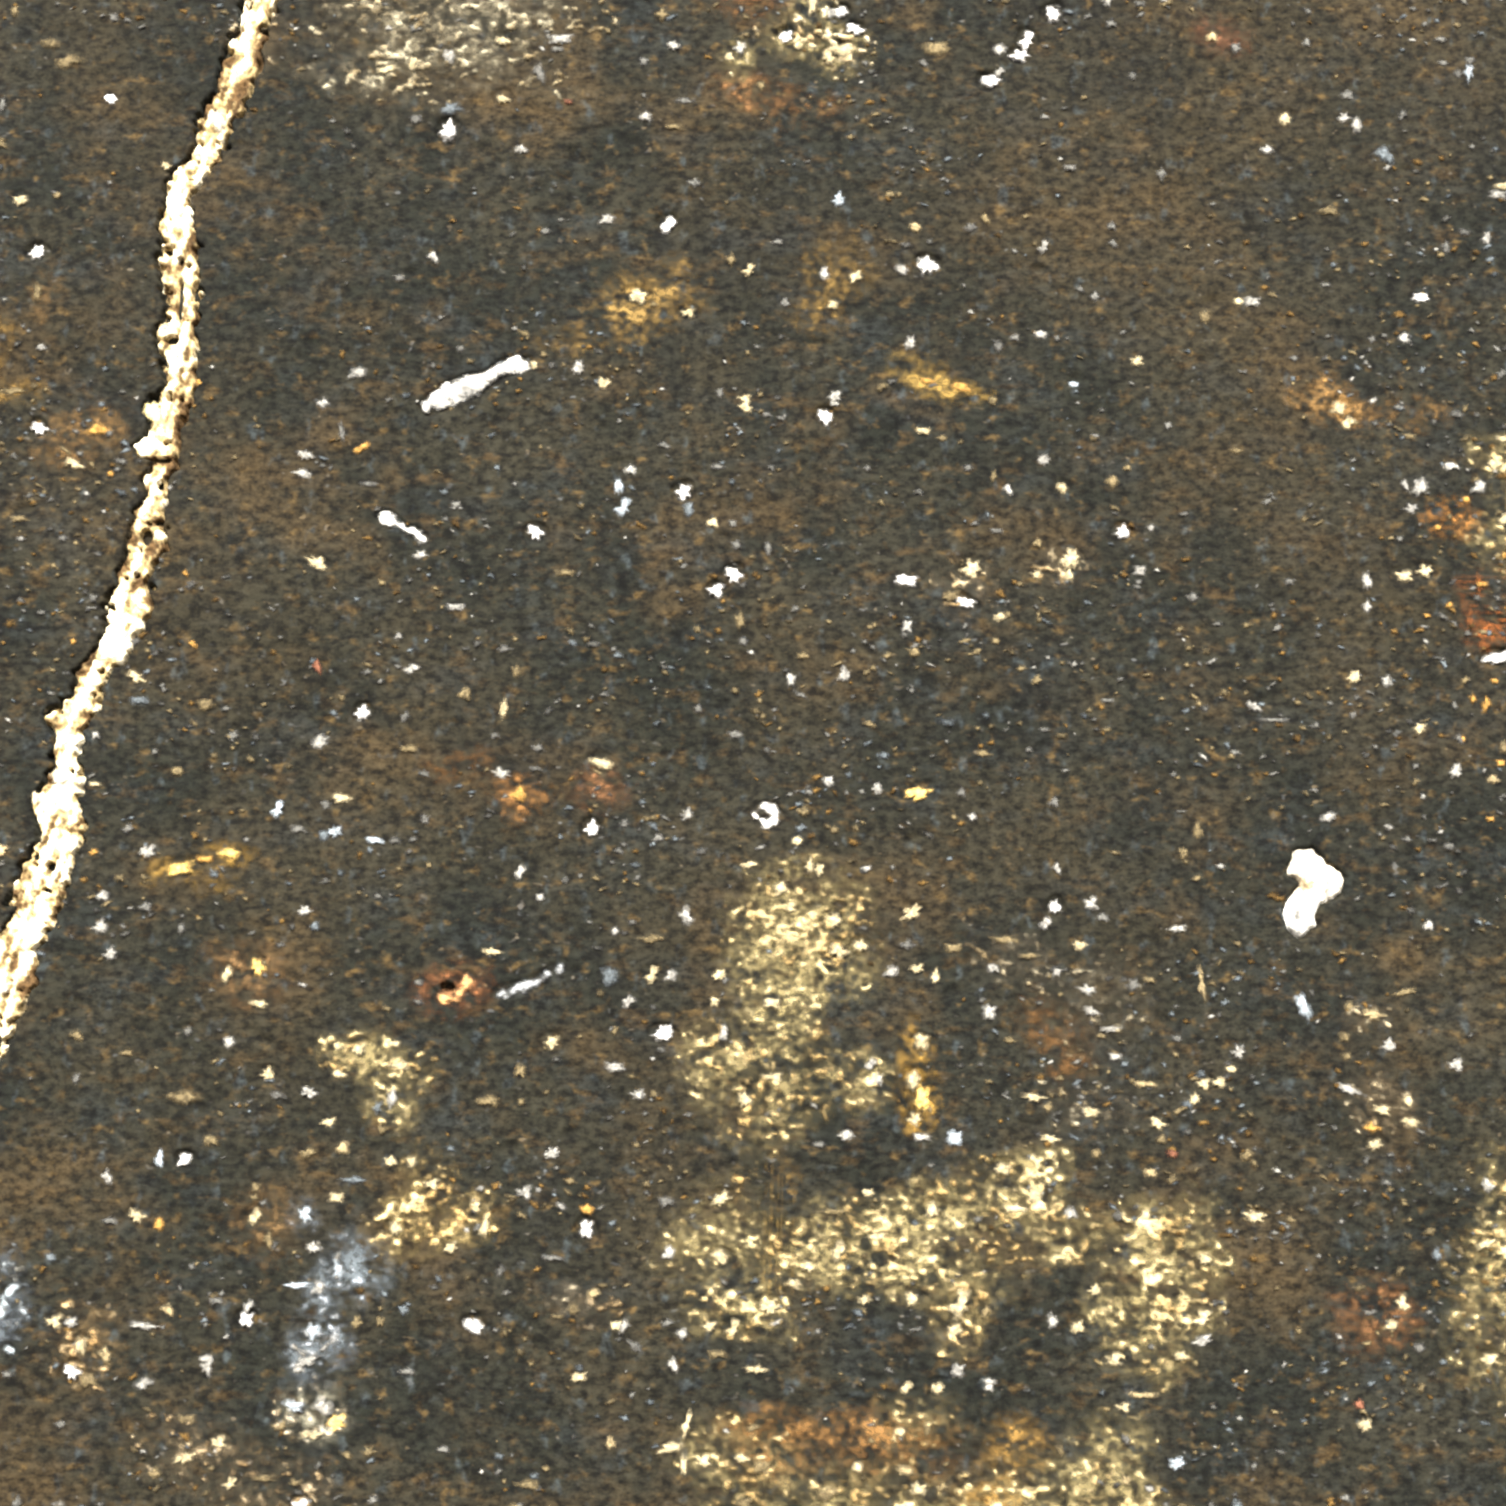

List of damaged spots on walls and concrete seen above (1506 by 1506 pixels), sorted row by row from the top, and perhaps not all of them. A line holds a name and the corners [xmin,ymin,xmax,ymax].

crack [0,0,279,1061]